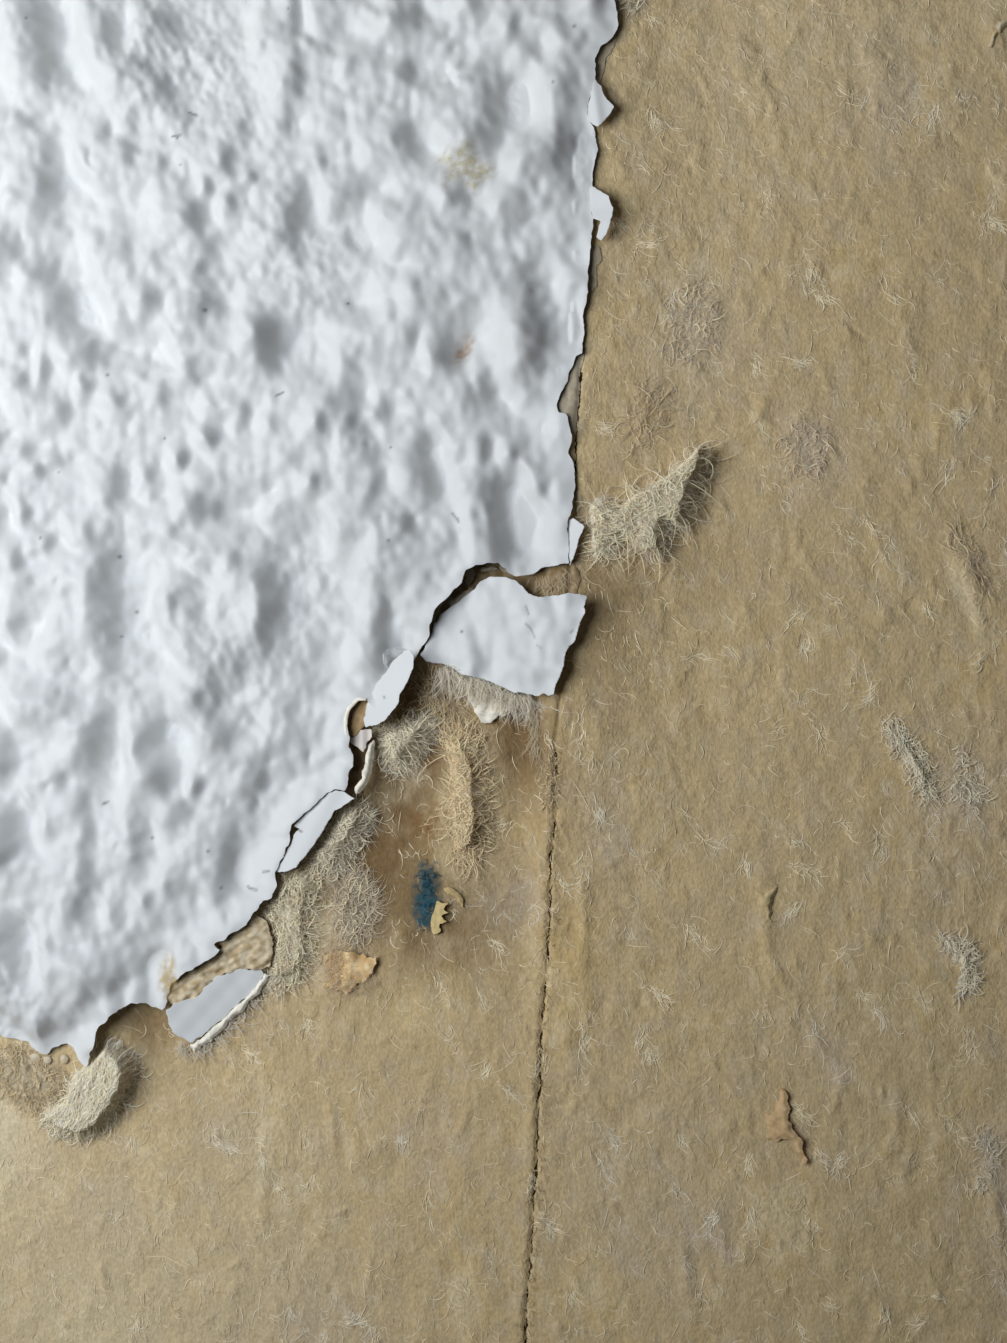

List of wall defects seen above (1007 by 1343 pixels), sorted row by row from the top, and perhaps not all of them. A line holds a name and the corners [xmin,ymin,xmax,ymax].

peeling [587,79,614,127]
peeling [590,186,613,240]
peeling [568,518,584,565]
peeling [363,565,587,772]
peeling [277,790,354,872]
peeling [431,887,463,934]
peeling [163,913,291,1070]
peeling [305,920,390,1007]
crack [516,749,565,1343]
peeling [765,1089,808,1165]